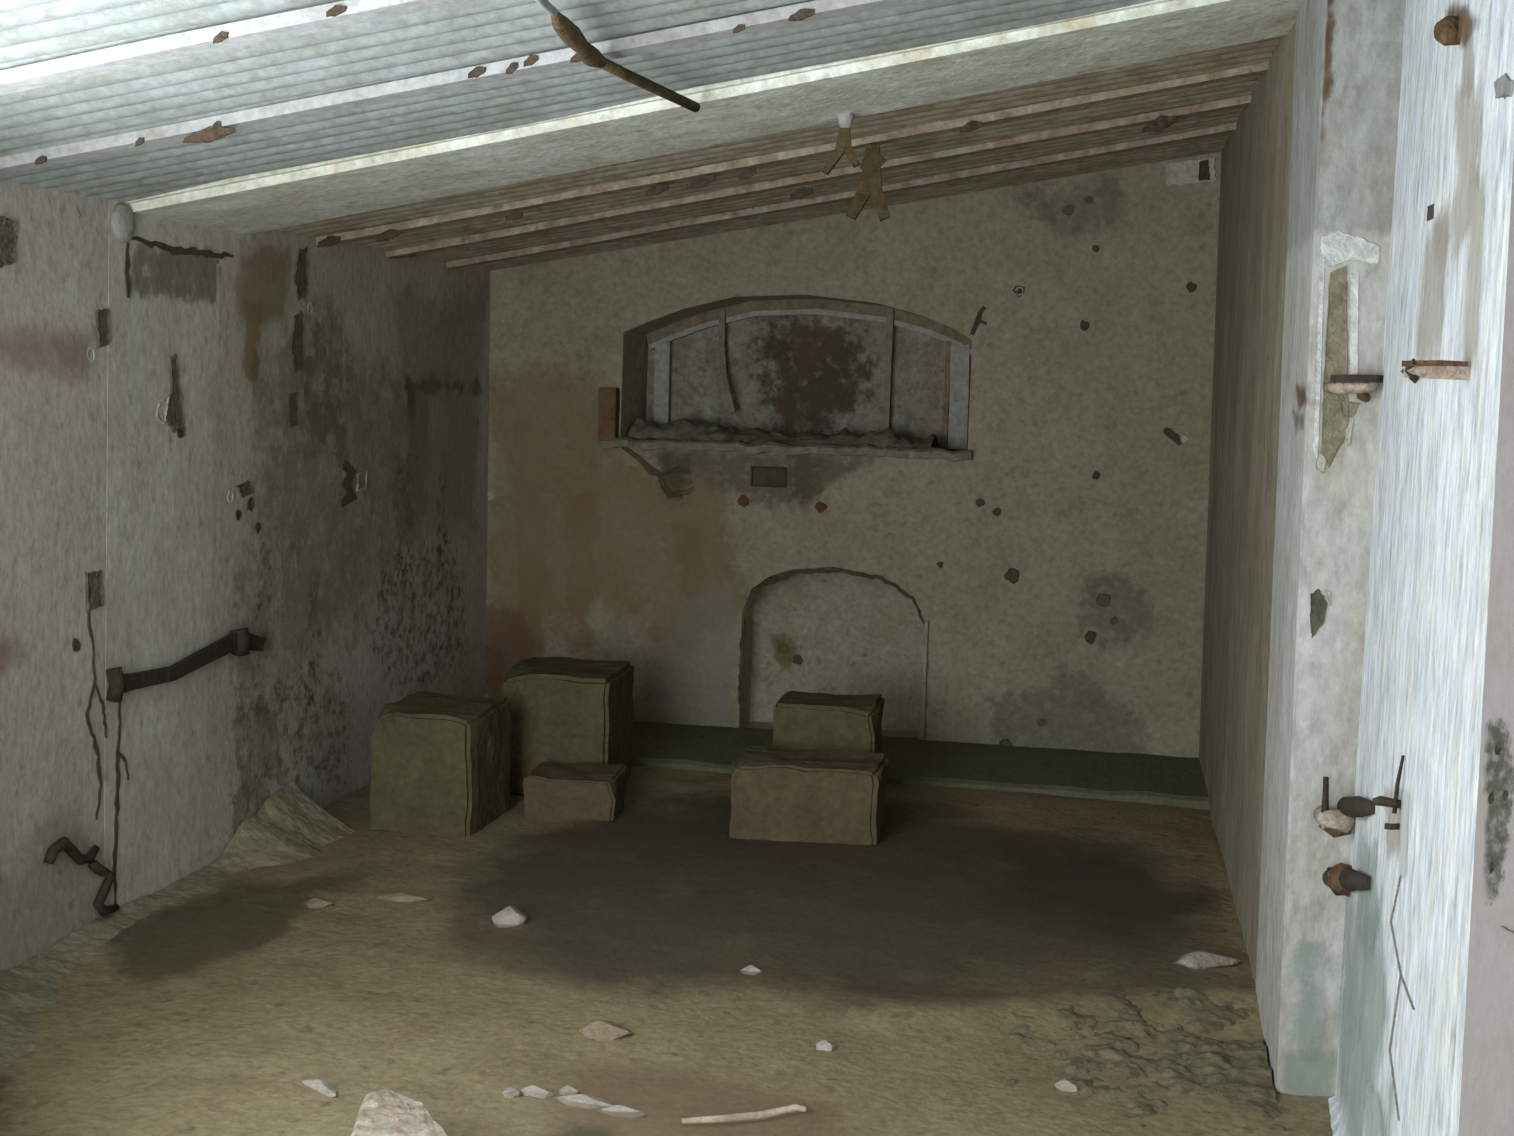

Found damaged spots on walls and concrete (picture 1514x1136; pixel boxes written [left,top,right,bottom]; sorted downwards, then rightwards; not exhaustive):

corrosion [213,31,229,44]
corrosion [326,5,347,17]
corrosion [468,66,486,79]
corrosion [506,54,539,74]
corrosion [183,121,236,143]
spalling [0,215,18,268]
leakage [240,248,286,379]
peeling [1313,230,1381,473]
peeling [155,353,185,438]
leakage [492,377,739,660]
crack [85,605,129,904]
leakage [1485,719,1514,904]